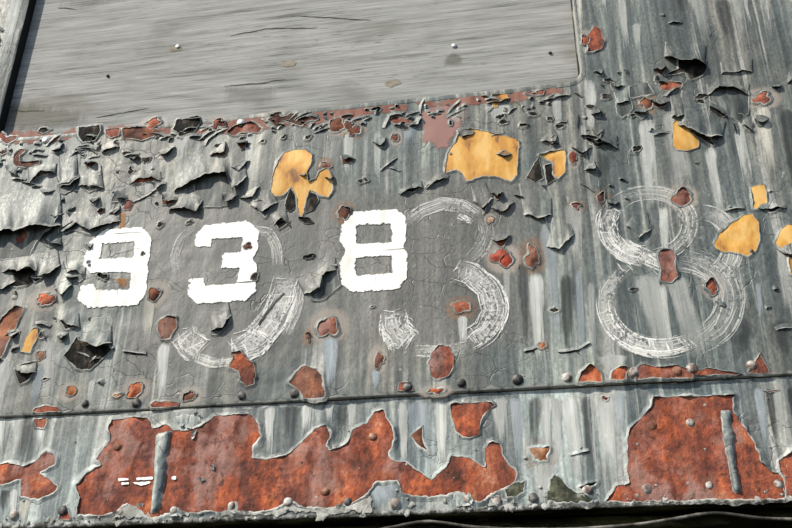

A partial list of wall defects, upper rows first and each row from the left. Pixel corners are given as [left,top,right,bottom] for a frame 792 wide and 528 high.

peeling [0,42,769,386]
corrosion [655,247,681,285]
peeling [712,183,792,276]
corrosion [0,344,520,523]
corrosion [574,352,792,506]